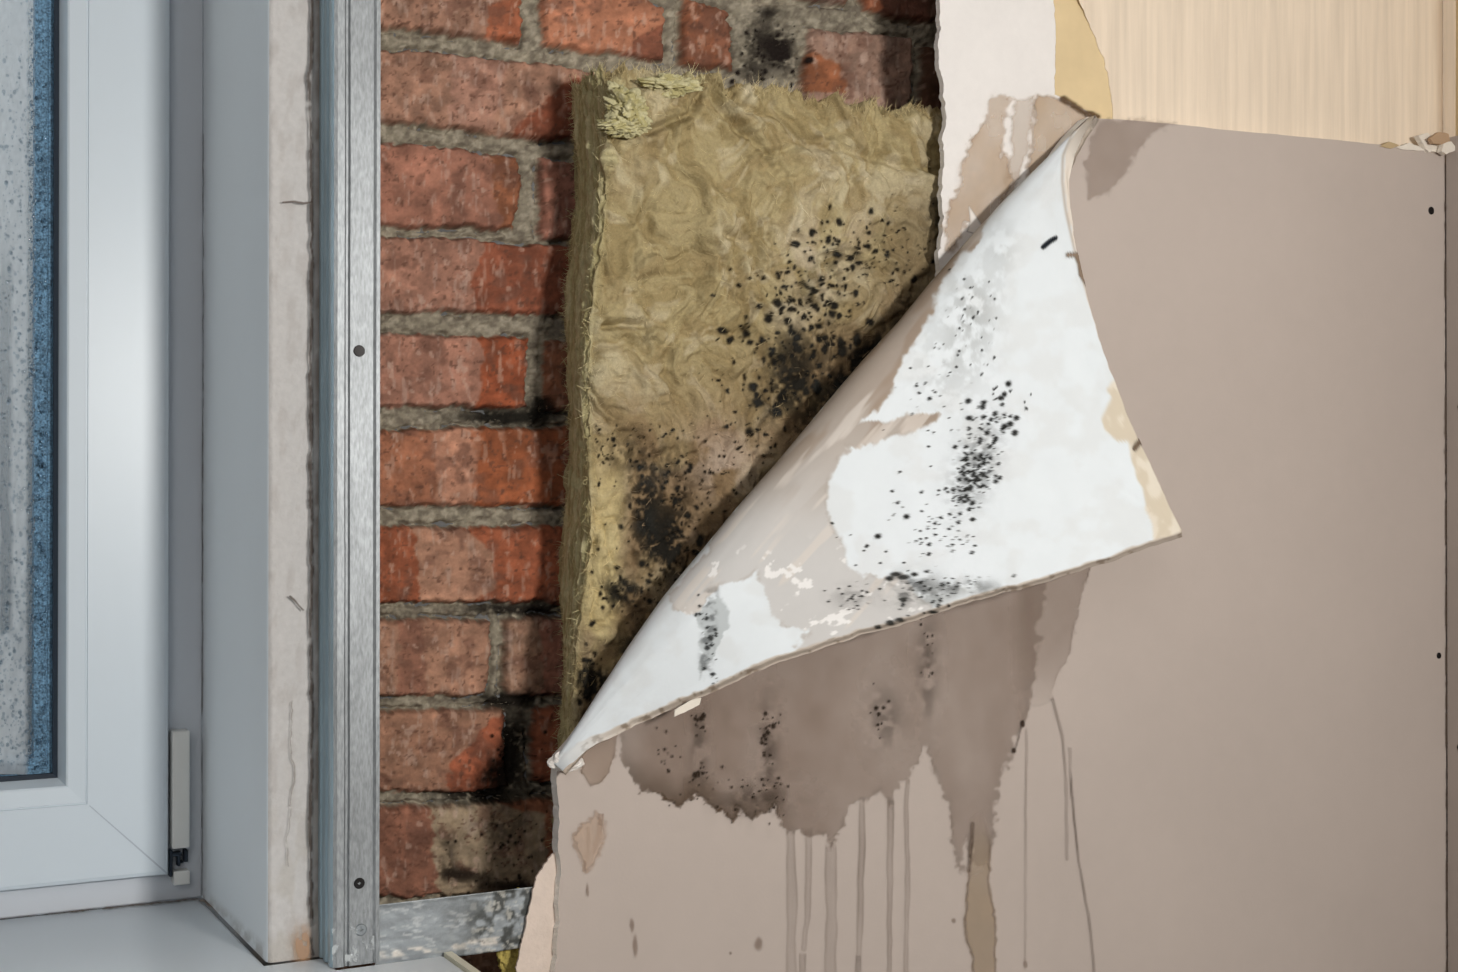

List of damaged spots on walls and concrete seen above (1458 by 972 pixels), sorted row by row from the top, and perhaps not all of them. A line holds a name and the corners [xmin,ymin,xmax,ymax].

spalling [1379,0,1458,155]
water stain [577,96,1100,706]
spalling [547,751,585,772]
peeling [674,698,701,717]
water stain [630,712,789,828]
water stain [964,858,997,972]